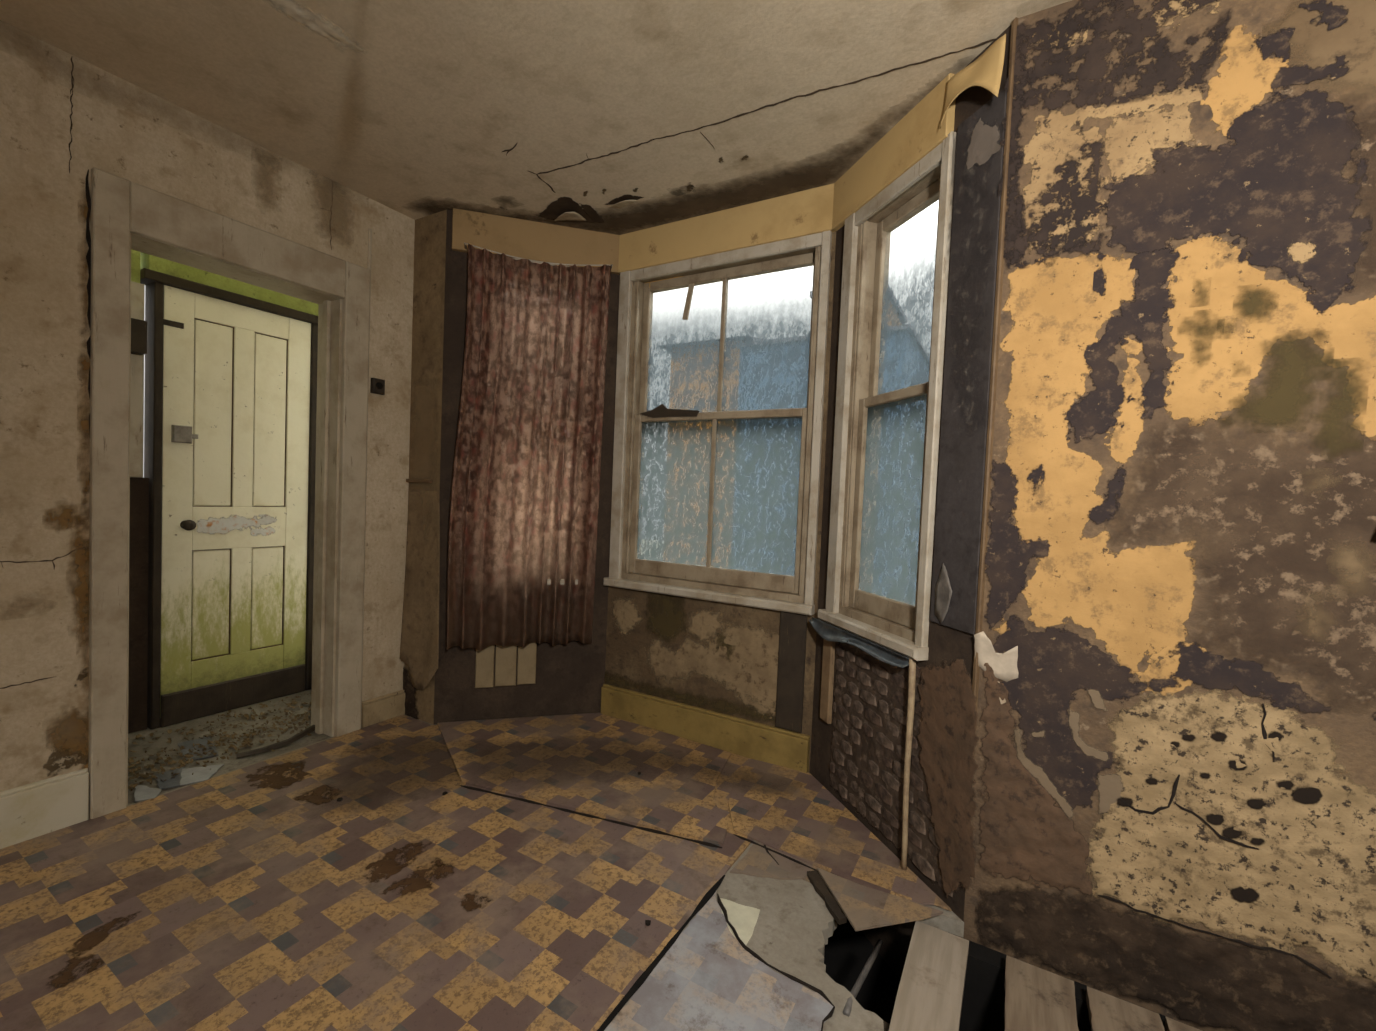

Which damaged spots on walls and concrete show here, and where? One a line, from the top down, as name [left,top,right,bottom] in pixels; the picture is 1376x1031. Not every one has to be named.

peeling [1142,0,1222,40]
peeling [539,195,644,223]
water stain [414,128,883,235]
crack [502,38,996,193]
peeling [966,118,1001,170]
water stain [998,0,1376,443]
peeling [612,598,642,635]
peeling [647,611,779,719]
flaking render [975,24,1376,1031]
water stain [984,332,1376,809]